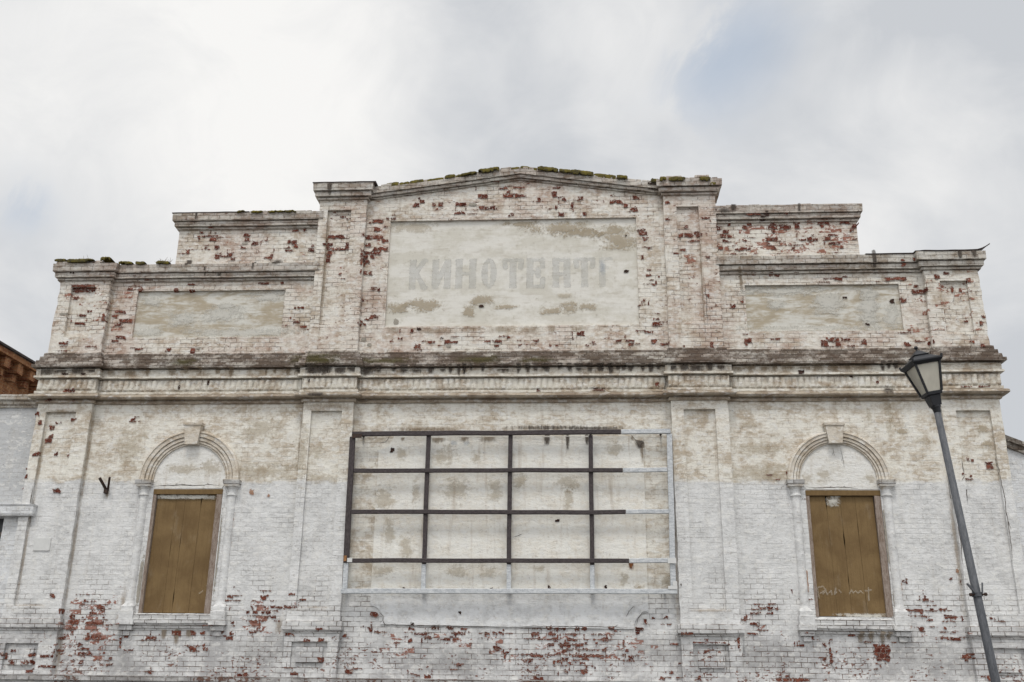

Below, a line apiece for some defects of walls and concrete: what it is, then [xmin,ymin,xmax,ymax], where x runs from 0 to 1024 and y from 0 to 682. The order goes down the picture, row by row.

spalling [178,214,396,301]
spalling [700,210,859,259]
spalling [70,272,100,300]
spalling [70,310,143,351]
water stain [265,363,485,375]
water stain [499,362,865,373]
spalling [0,586,324,673]
spalling [363,603,778,680]
spalling [848,634,896,670]
spalling [893,590,967,643]